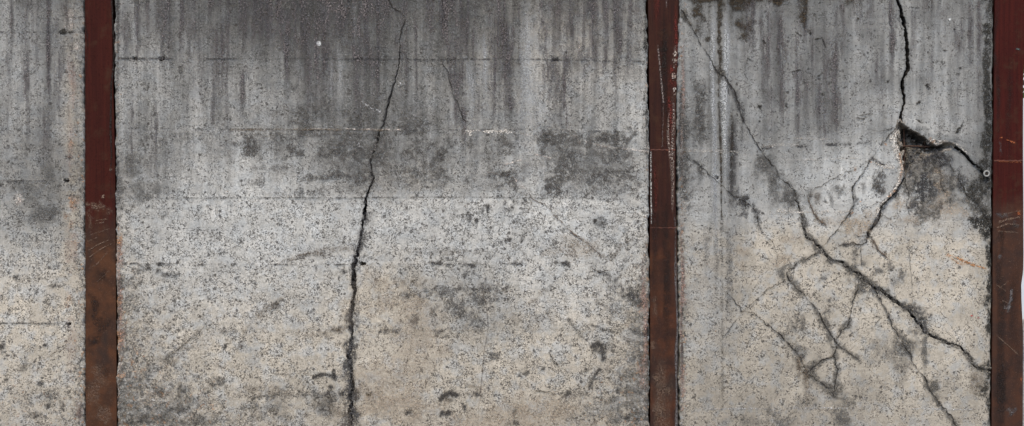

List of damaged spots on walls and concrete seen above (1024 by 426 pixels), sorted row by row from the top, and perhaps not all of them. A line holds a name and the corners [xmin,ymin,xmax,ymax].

water stain [199,0,390,105]
crack [341,0,406,426]
water stain [397,0,530,137]
water stain [541,0,636,119]
water stain [709,0,748,218]
water stain [746,0,873,133]
water stain [755,154,870,232]
crack [681,0,991,426]
spalling [875,119,966,219]